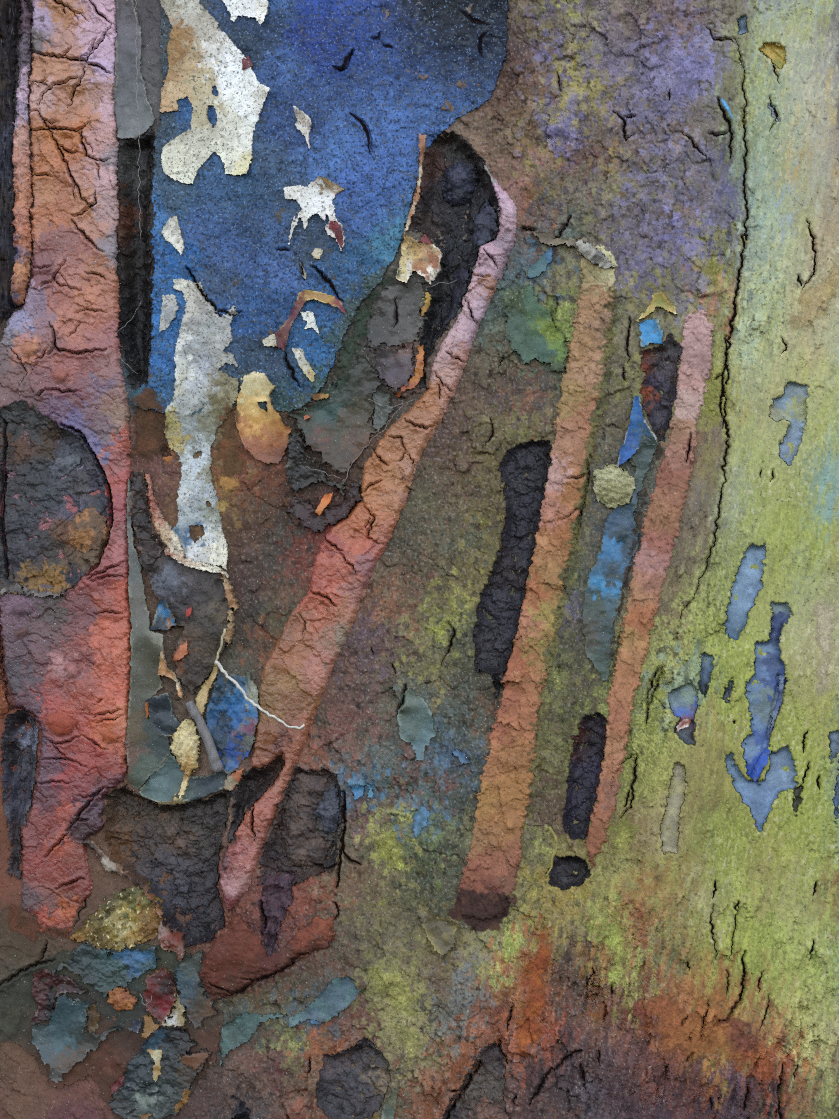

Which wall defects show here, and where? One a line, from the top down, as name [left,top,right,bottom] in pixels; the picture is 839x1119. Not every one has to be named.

crack [10,0,112,396]
spalling [115,129,156,389]
spalling [409,129,500,391]
crack [613,111,635,141]
crack [680,27,780,619]
crack [63,425,128,582]
peeling [234,371,363,534]
spalling [473,439,551,697]
crack [39,698,121,858]
spalling [32,669,345,1084]
rust [517,933,549,1056]
rust [633,986,779,1081]